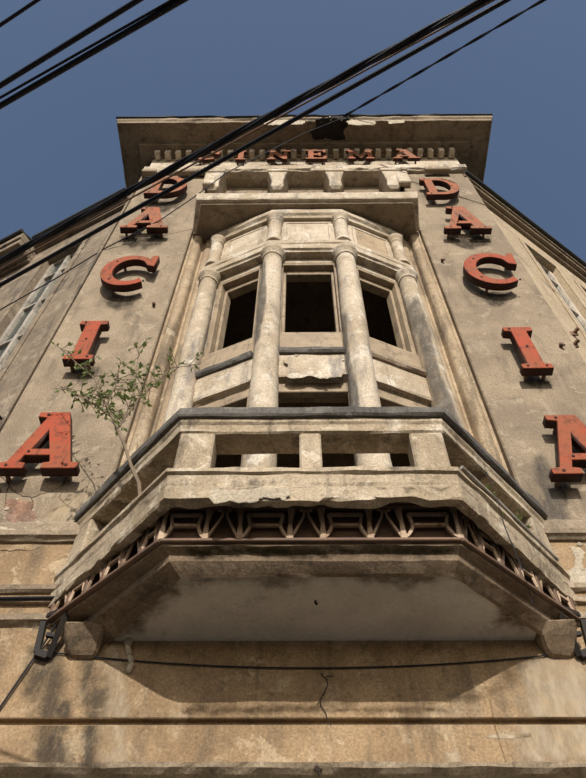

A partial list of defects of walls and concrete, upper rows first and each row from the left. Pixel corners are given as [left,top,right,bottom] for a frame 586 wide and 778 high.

spalling [310,116,376,140]
peeling [283,354,345,379]
spalling [0,498,36,530]
peeling [209,486,291,504]
peeling [567,542,586,583]
water stain [27,646,70,763]
water stain [82,651,126,763]
crack [317,673,335,726]